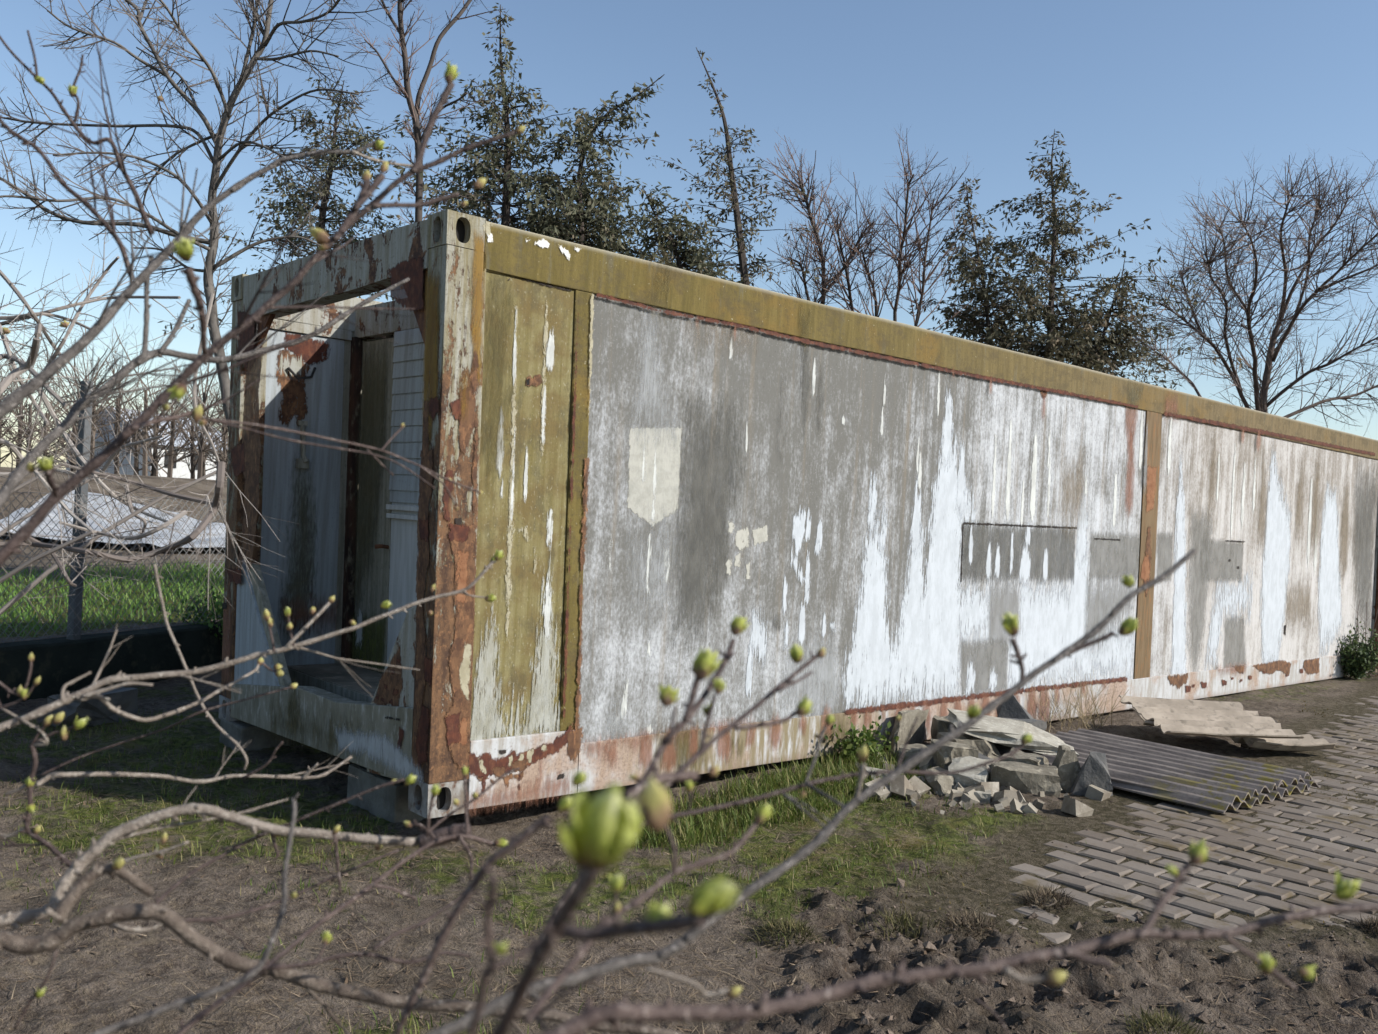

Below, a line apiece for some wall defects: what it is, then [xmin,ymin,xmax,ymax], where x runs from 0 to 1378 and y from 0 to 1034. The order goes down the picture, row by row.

corrosion [227,311,330,585]
corrosion [372,236,616,810]
corrosion [596,292,1157,597]
damp [969,420,1087,642]
damp [1210,446,1266,538]
damp [1295,467,1319,574]
damp [1340,488,1349,576]
damp [1086,575,1136,648]
corrosion [632,717,780,769]
corrosion [823,676,1128,732]
damp [966,661,997,696]
corrosion [1168,657,1320,692]